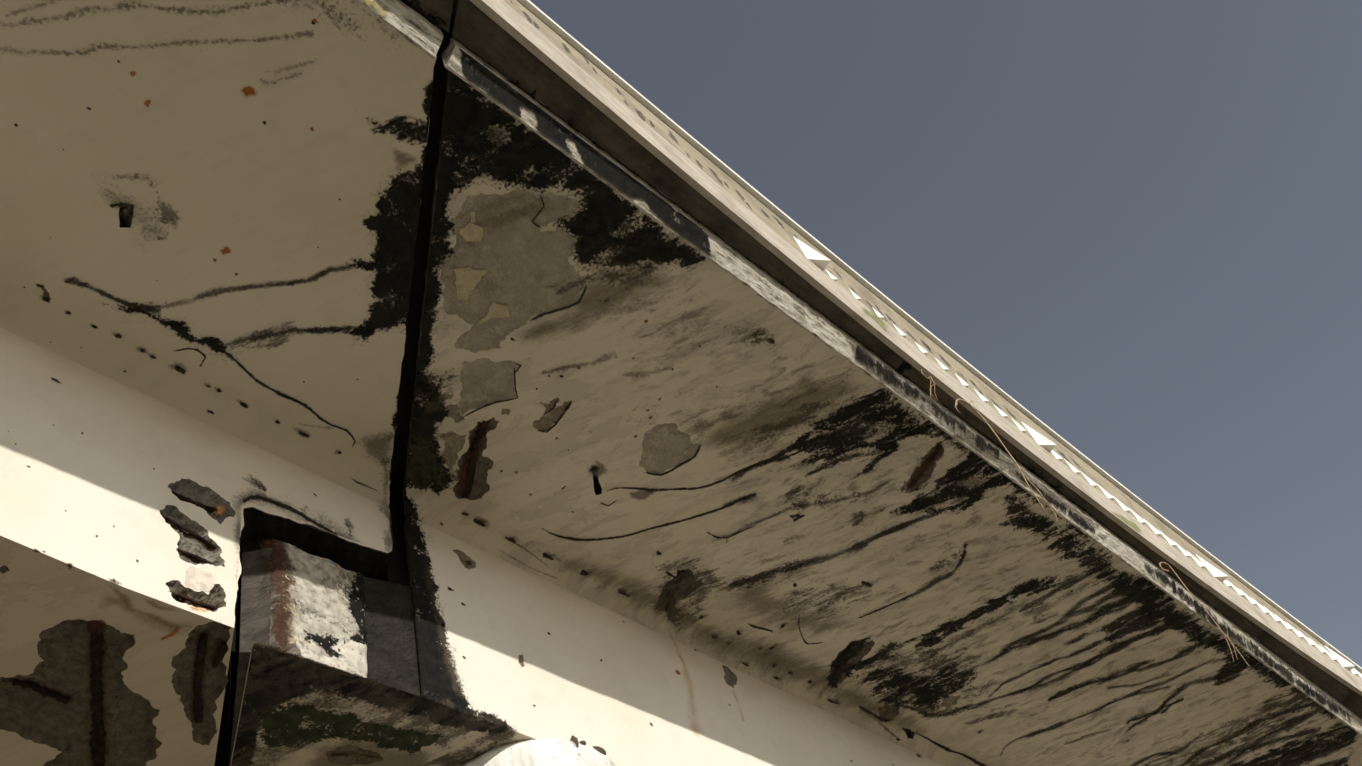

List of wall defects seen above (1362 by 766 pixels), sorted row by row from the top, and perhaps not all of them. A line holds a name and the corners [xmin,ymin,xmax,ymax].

spalling [0,619,162,766]
spalling [160,478,235,745]
rust [260,539,297,652]
water stain [64,48,712,766]
peeling [439,190,587,500]
crack [507,467,754,552]
peeling [639,423,701,476]
water stain [716,337,1358,766]